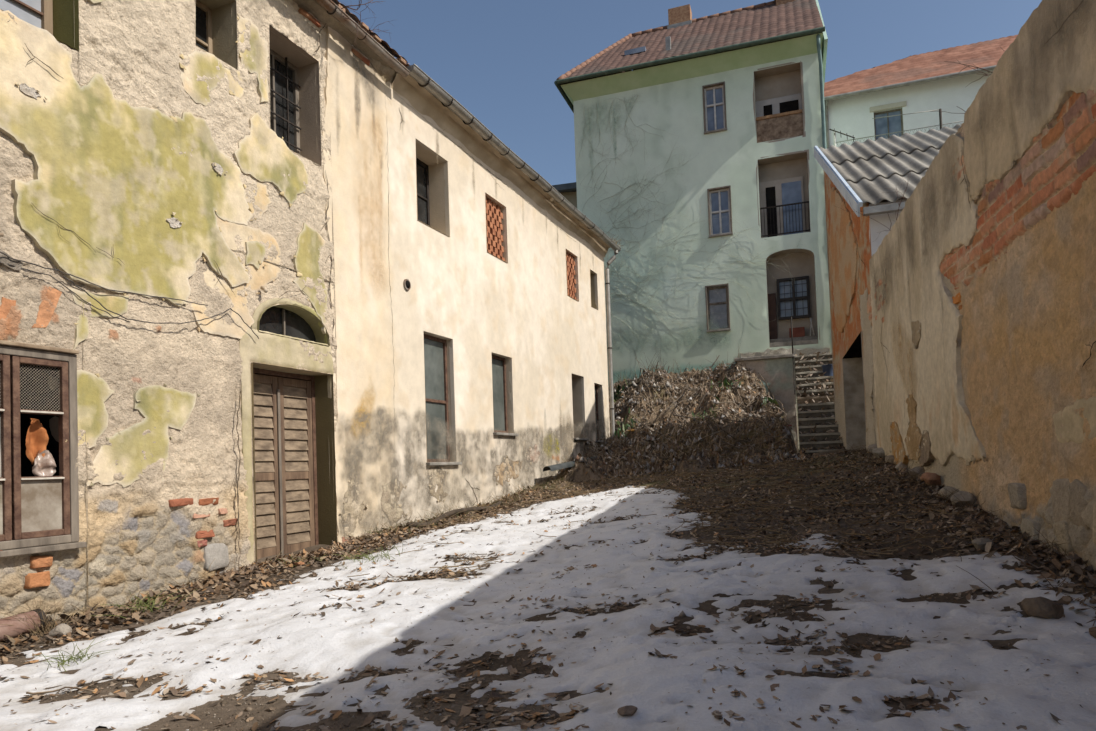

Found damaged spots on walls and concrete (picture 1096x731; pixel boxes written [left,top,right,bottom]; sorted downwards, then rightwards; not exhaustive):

peeling [0,0,338,622]
water stain [341,409,609,533]
flaking render [740,347,830,358]
peeling [860,0,1096,467]